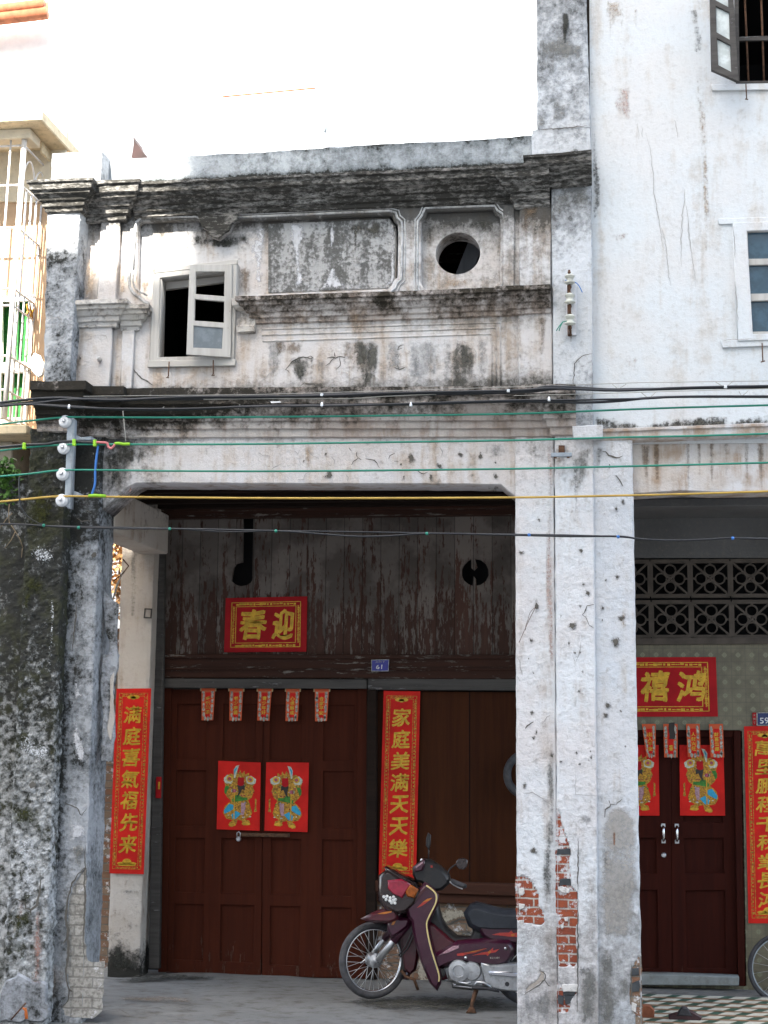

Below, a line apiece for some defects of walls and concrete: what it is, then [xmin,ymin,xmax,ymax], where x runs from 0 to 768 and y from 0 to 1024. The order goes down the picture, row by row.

crack [637,124,696,280]
water stain [291,224,304,285]
water stain [323,268,350,288]
water stain [352,222,394,285]
water stain [446,343,482,386]
spalling [515,808,585,972]
spalling [63,870,105,1019]
spalling [557,982,578,1013]